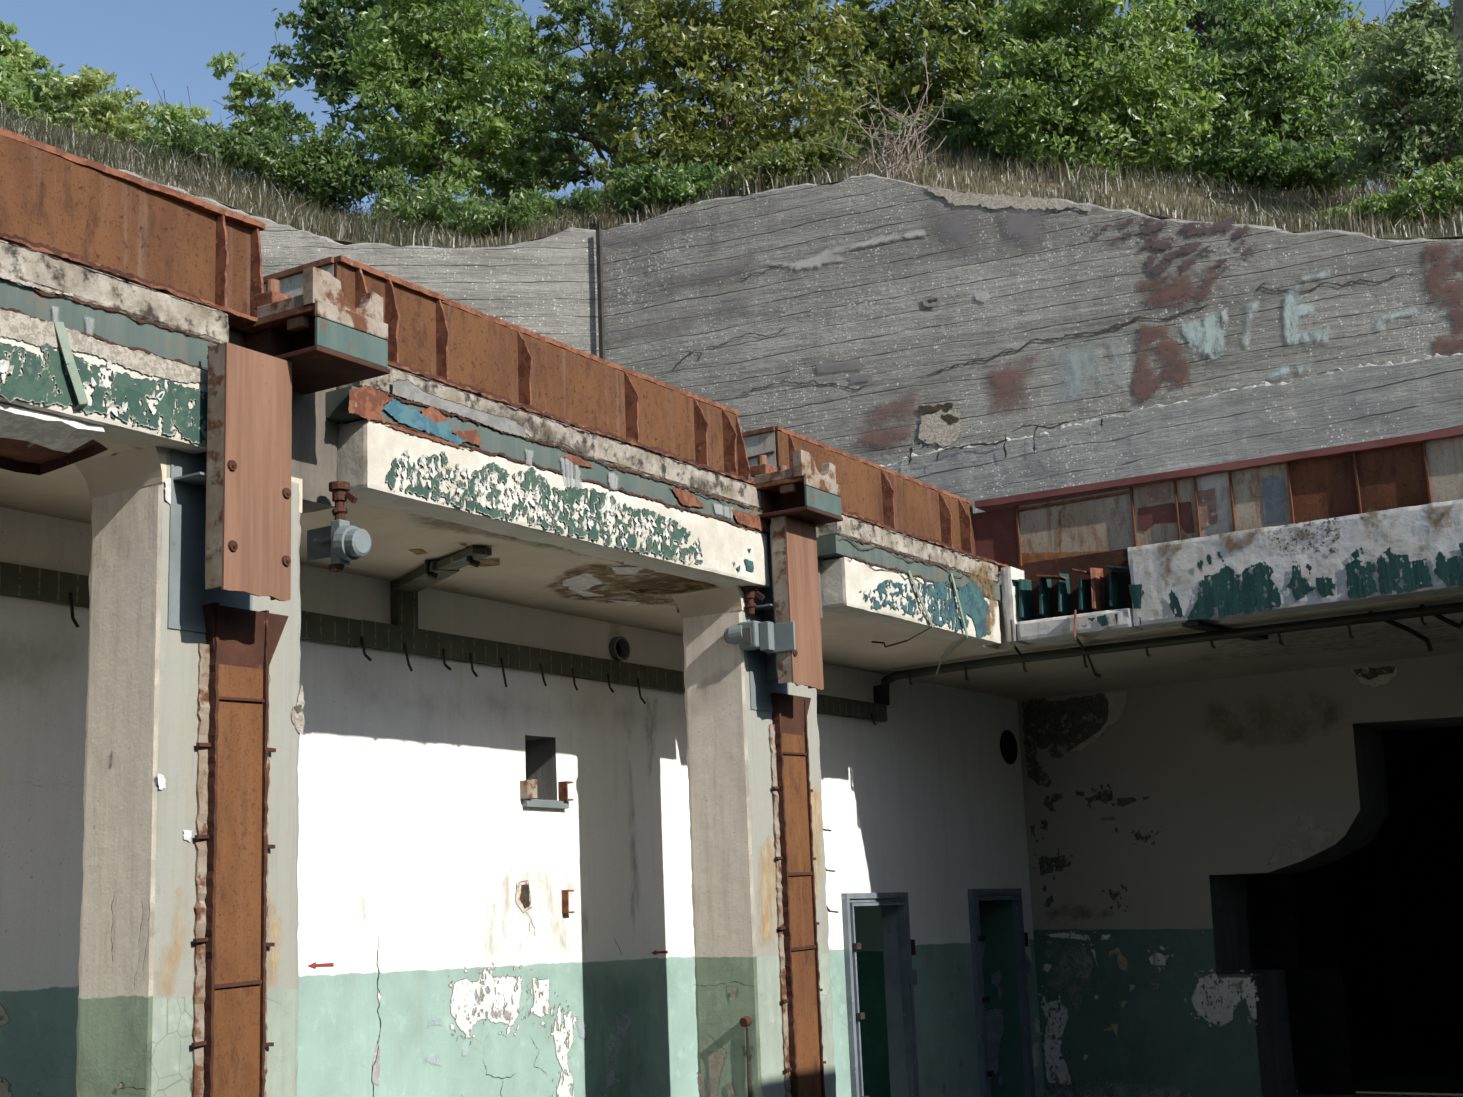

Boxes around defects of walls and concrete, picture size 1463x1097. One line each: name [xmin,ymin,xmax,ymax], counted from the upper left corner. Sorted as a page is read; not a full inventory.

crack [1256,274,1409,293]
peeling [0,309,208,445]
crack [917,304,1209,378]
corrosion [348,386,482,449]
crack [908,419,1103,464]
peeling [383,399,717,607]
corrosion [671,486,706,507]
corrosion [731,509,769,532]
peeling [1169,543,1463,621]
corrosion [811,791,821,892]
crack [372,927,381,1097]
peeling [443,963,579,1097]